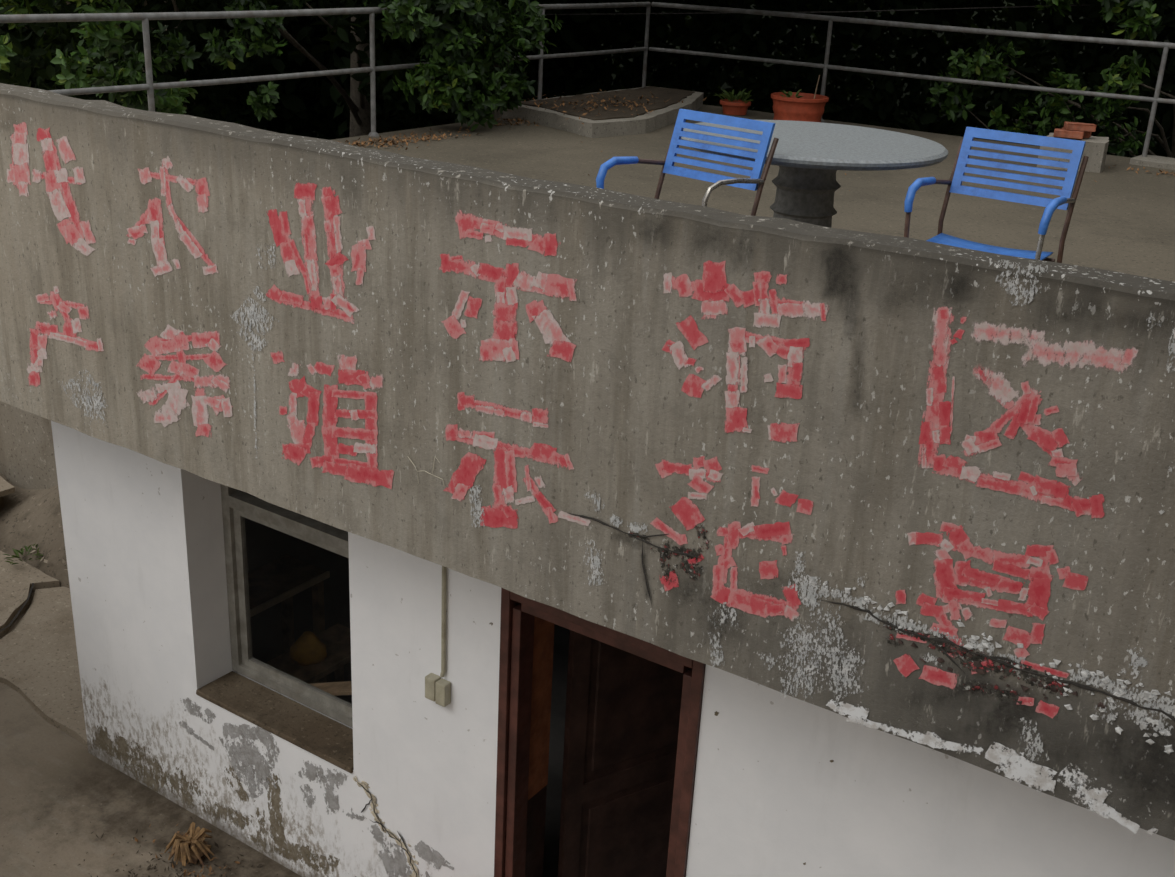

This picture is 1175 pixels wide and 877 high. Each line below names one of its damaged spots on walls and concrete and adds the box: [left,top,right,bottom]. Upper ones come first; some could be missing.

crack [568,513,703,605]
flaking render [788,551,1175,736]
crack [810,579,1175,754]
peeling [295,760,454,877]
crack [353,776,420,877]
peeling [826,700,1158,835]